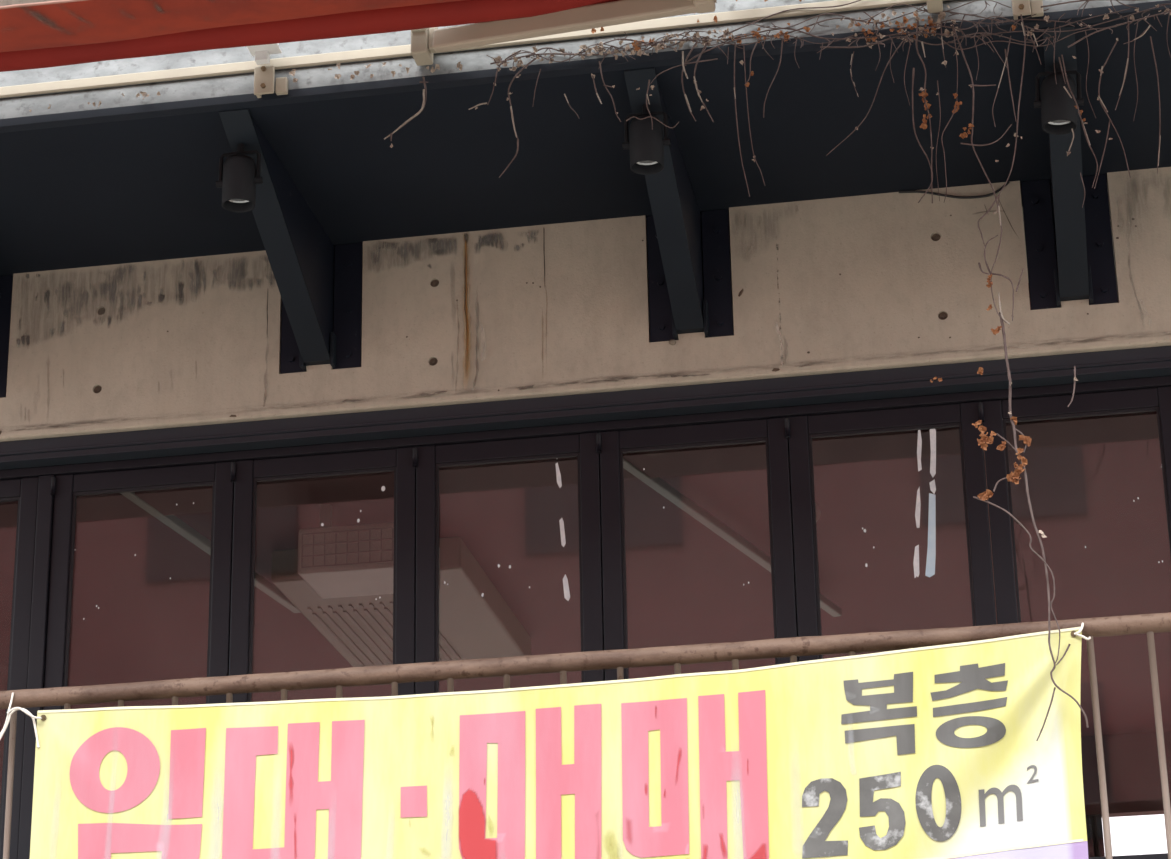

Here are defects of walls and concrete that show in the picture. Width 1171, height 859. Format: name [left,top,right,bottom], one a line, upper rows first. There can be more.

damp [36,261,216,326]